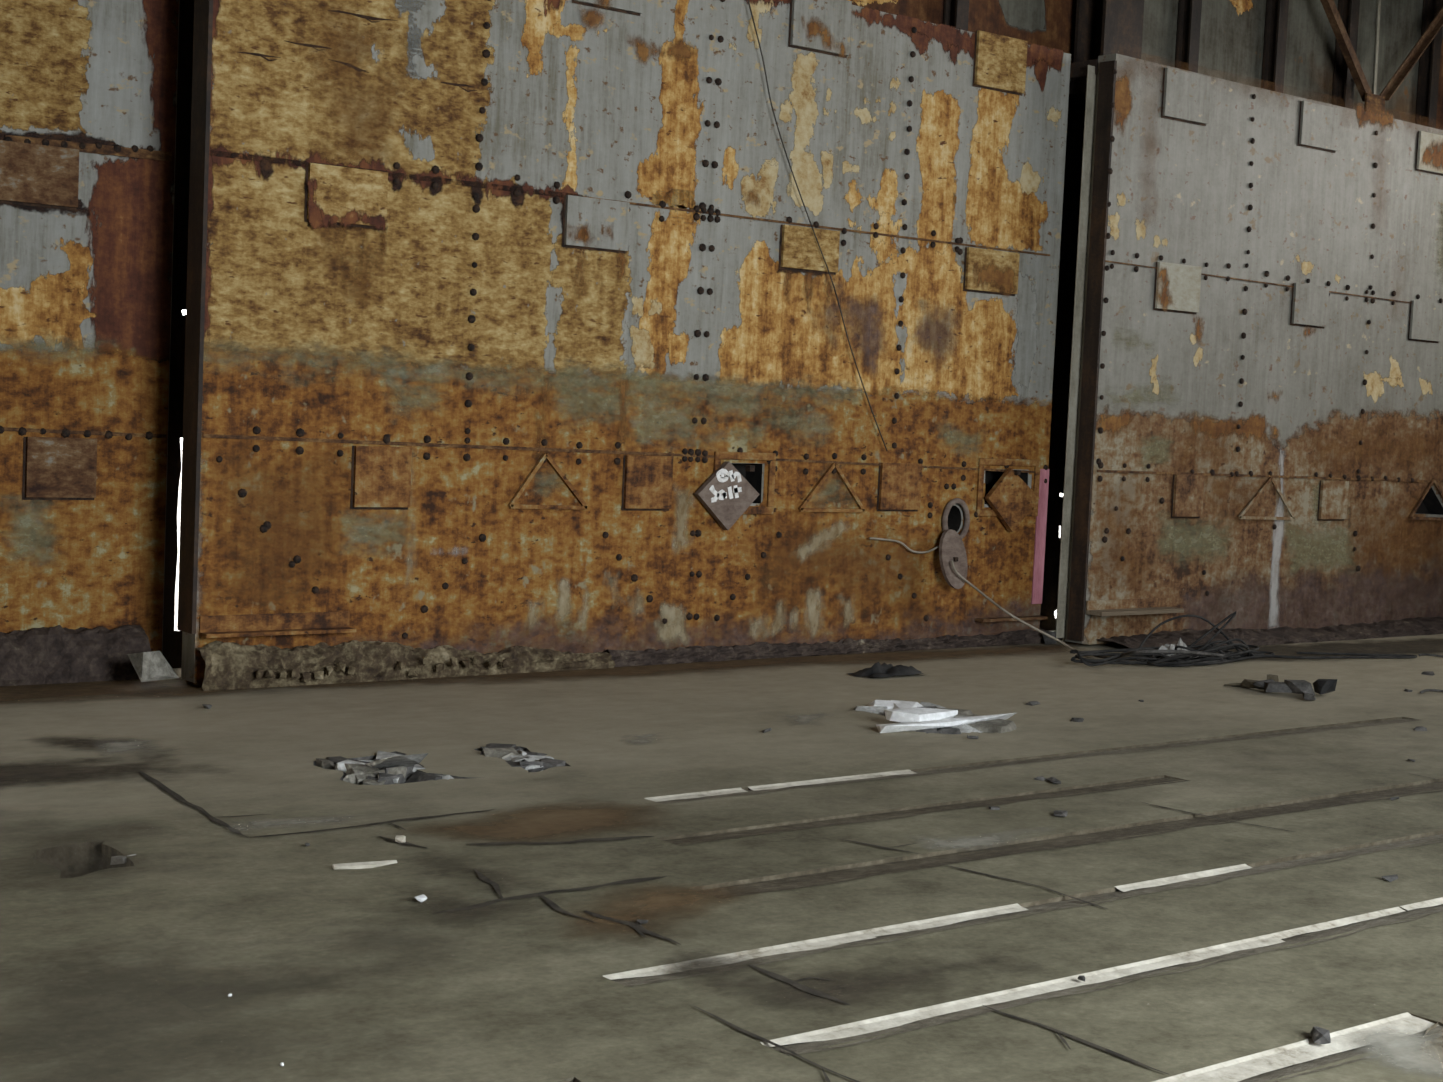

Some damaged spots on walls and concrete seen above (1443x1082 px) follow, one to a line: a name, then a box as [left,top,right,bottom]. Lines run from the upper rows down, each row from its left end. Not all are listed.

peeling [521,0,607,78]
peeling [729,0,774,51]
peeling [399,125,435,162]
peeling [741,52,860,218]
rust [0,0,179,362]
peeling [1108,192,1168,248]
peeling [630,295,662,373]
peeling [1363,356,1433,404]
rust [1192,392,1279,440]
spalling [1114,864,1252,892]
spalling [760,897,1443,1047]
spalling [1152,1012,1439,1082]